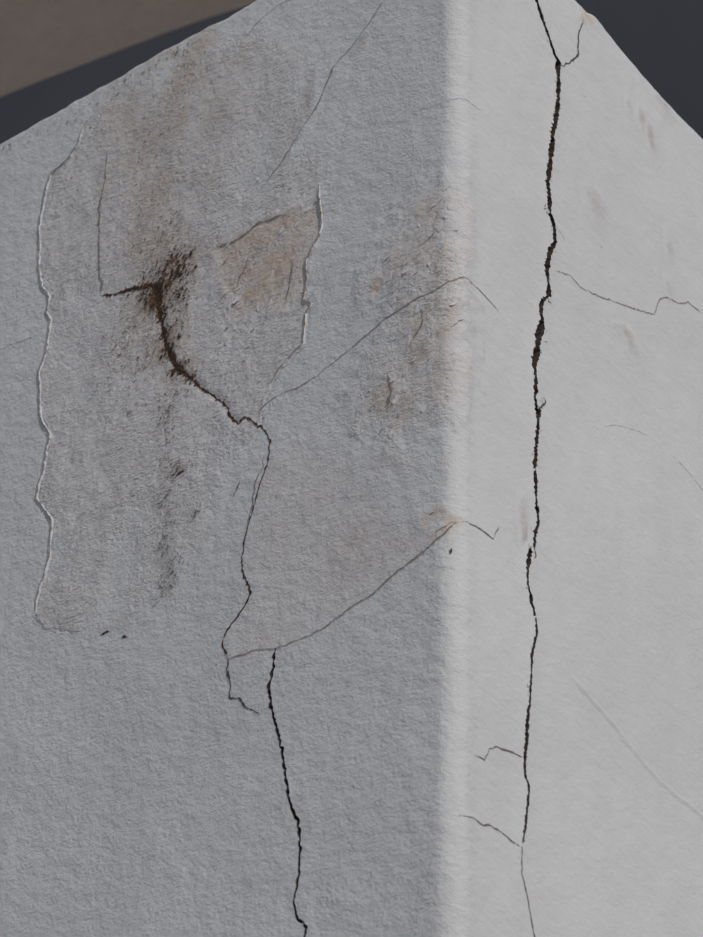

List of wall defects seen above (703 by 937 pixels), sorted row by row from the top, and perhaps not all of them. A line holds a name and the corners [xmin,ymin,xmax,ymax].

peeling [31,120,155,638]
leakage [73,217,221,650]
rust [61,48,252,431]
leakage [29,0,288,279]
peeling [187,0,333,579]
crack [97,150,500,937]
leakage [276,48,324,186]
crack [261,2,383,188]
leakage [202,416,468,687]
crack [459,0,699,937]